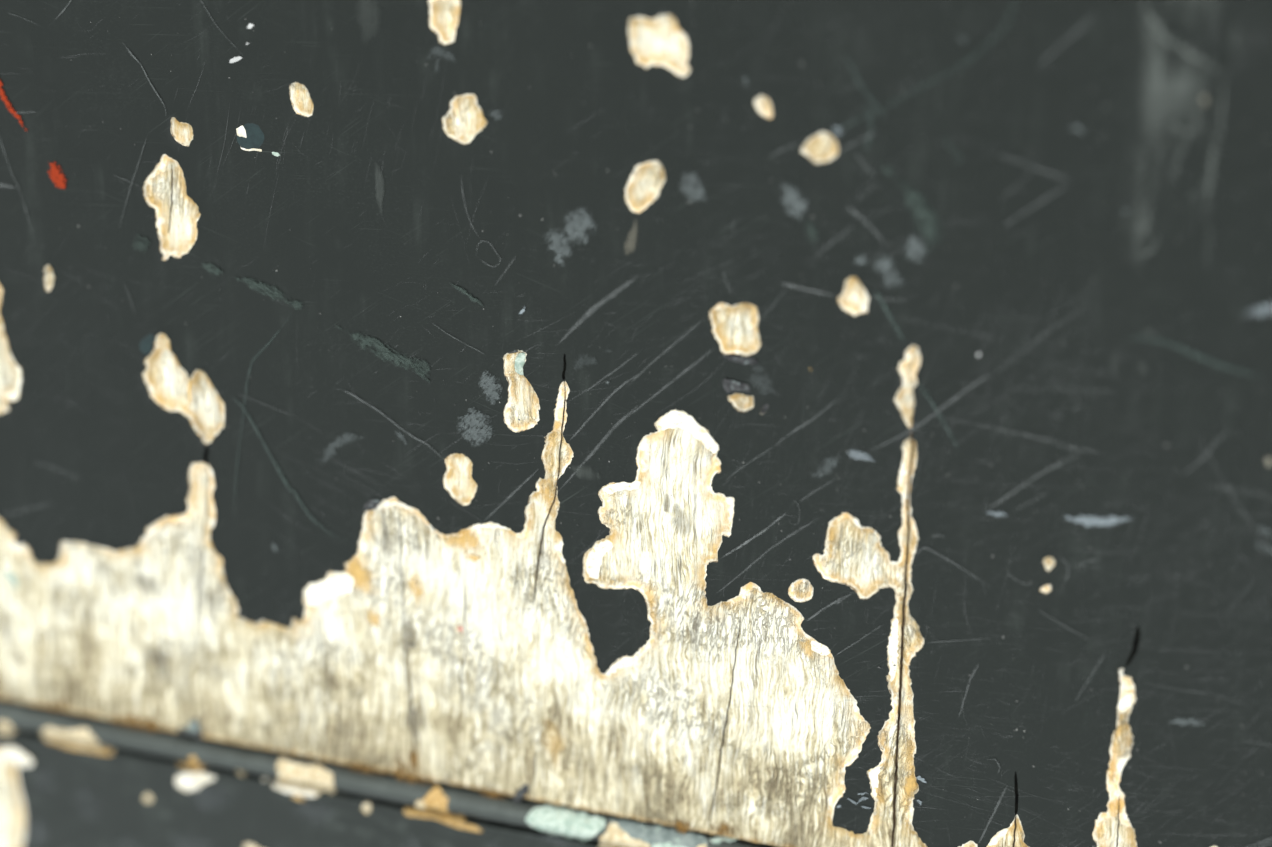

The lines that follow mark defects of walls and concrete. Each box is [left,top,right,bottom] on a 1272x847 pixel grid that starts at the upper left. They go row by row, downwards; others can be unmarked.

peeling [428,0,461,44]
peeling [629,14,691,77]
peeling [290,82,314,116]
peeling [443,94,487,144]
peeling [144,154,201,260]
peeling [625,160,665,213]
peeling [839,277,869,315]
peeling [0,286,22,413]
peeling [710,303,761,365]
peeling [0,333,927,847]
peeling [1093,668,1137,847]
peeling [958,814,1028,847]